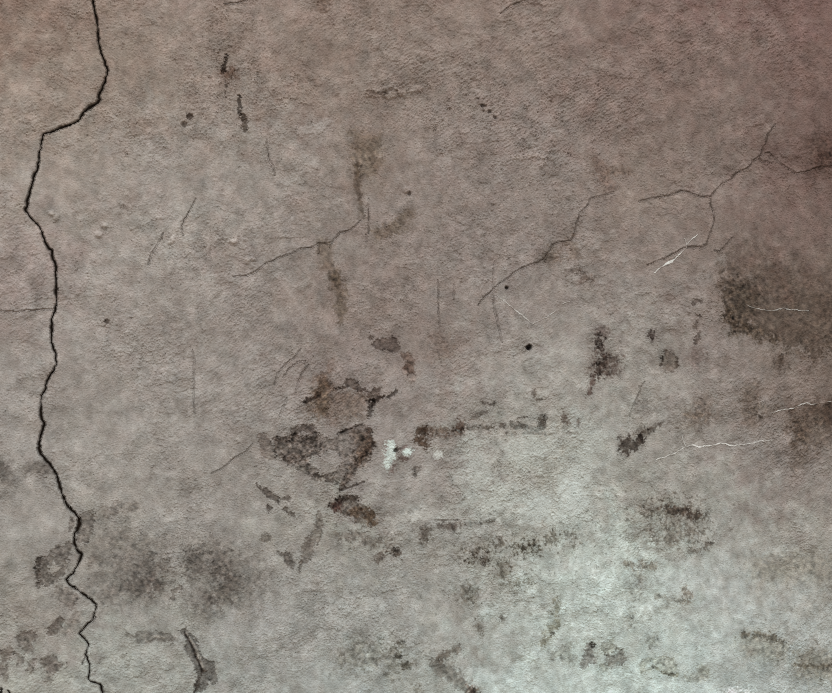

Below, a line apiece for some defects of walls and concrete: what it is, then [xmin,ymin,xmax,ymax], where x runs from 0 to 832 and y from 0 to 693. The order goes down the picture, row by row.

crack [500,0,527,14]
crack [639,124,832,273]
crack [233,215,366,278]
crack [478,192,614,325]
crack [0,0,109,693]
leakage [294,356,369,431]
leakage [326,386,616,642]
leakage [319,616,487,693]
leakage [532,593,571,653]